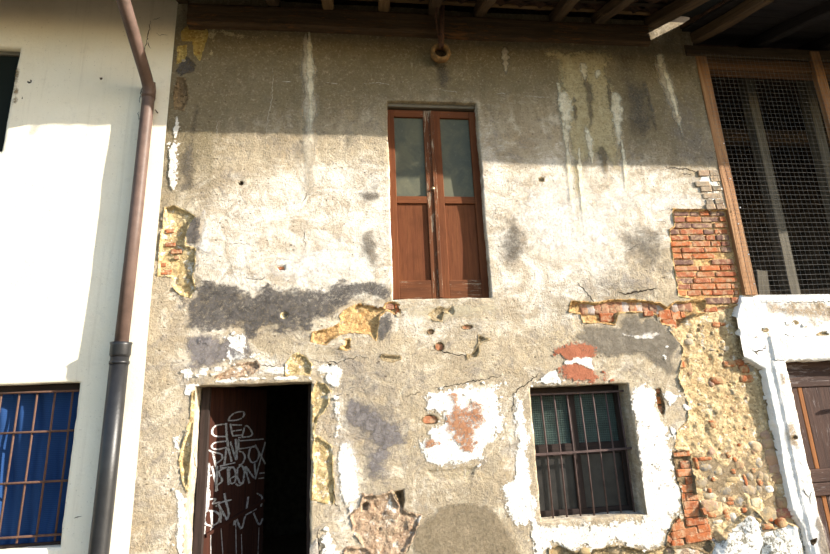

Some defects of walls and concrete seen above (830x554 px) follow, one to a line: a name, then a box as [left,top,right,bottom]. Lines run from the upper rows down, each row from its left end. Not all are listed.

leakage [302,34,316,194]
leakage [508,49,702,270]
spalling [157,205,196,298]
leakage [187,212,212,254]
leakage [180,232,390,368]
spalling [310,301,403,351]
leakage [379,313,393,340]
spalling [414,170,801,554]
leakage [577,315,680,374]
spalling [172,331,422,554]
leakage [347,399,407,479]
leakage [414,503,520,554]